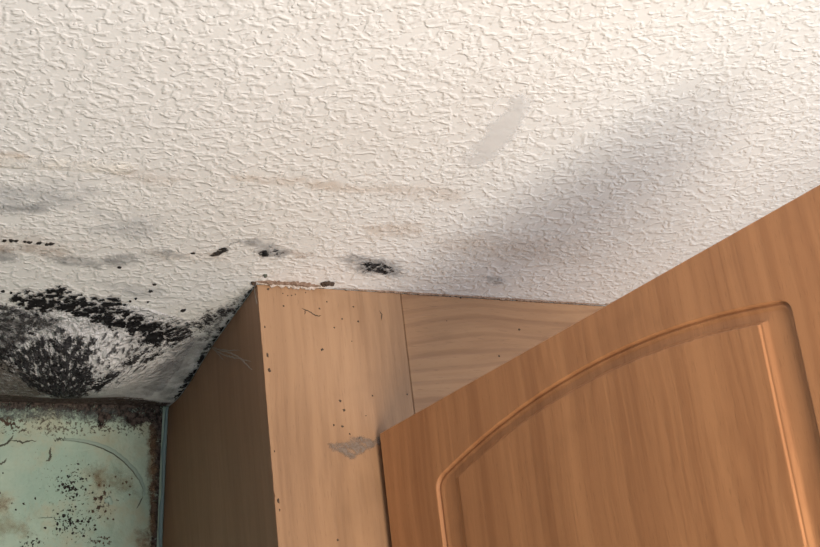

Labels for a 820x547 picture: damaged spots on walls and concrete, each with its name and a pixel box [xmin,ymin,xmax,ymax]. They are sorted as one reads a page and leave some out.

water stain [361,261,394,276]
water stain [0,285,254,547]